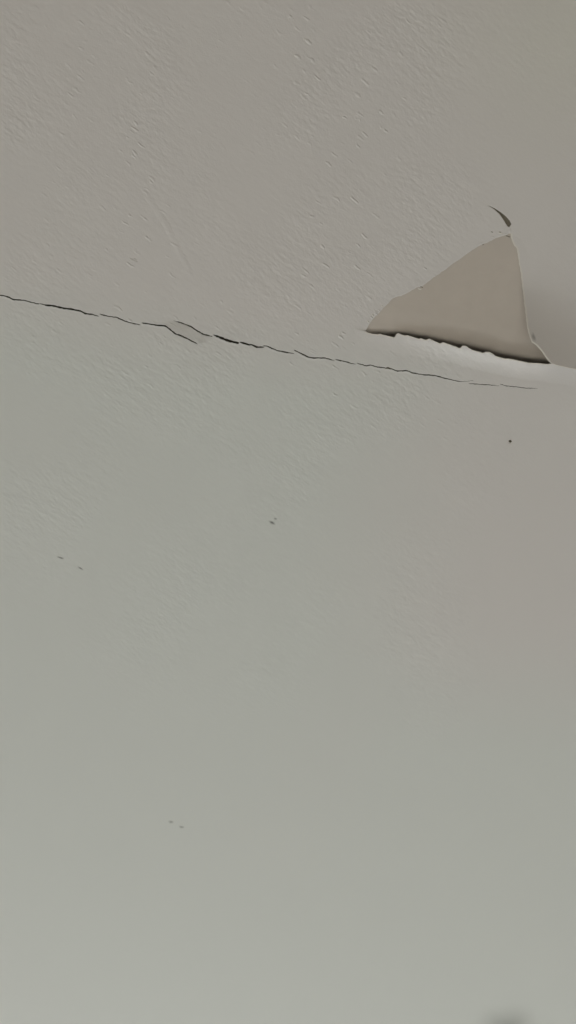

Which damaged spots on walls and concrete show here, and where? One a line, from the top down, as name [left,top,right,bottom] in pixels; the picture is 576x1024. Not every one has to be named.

crack [0,295,535,389]
peeling [353,226,576,388]